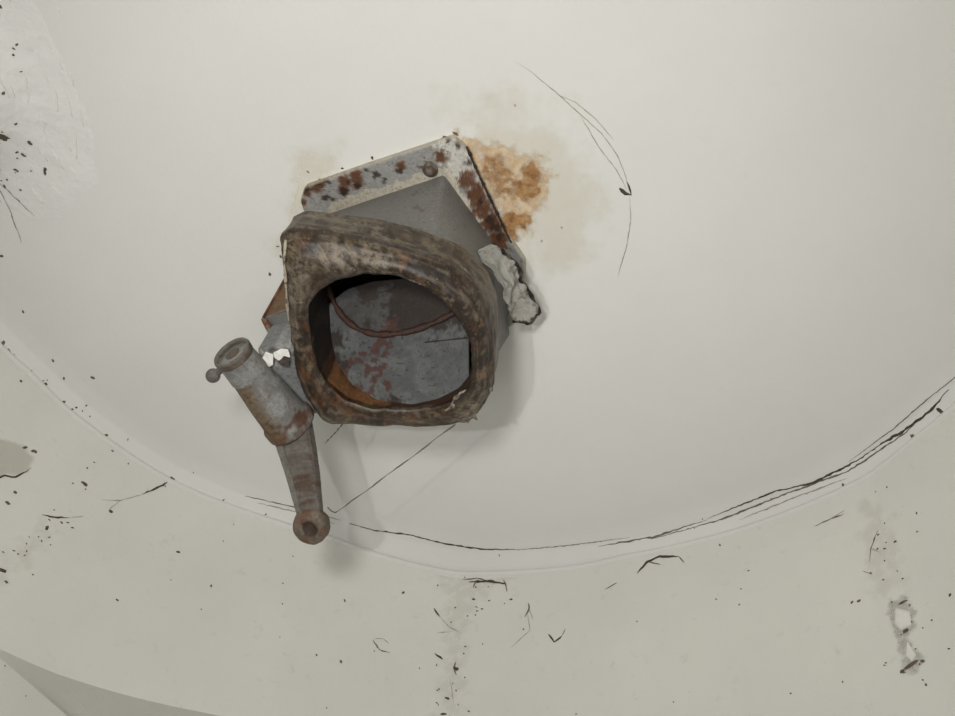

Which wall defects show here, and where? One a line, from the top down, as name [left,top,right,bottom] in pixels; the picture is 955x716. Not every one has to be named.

corrosion [463,139,548,243]
crack [516,62,632,278]
crack [110,482,168,509]
crack [246,496,296,512]
crack [330,377,955,573]